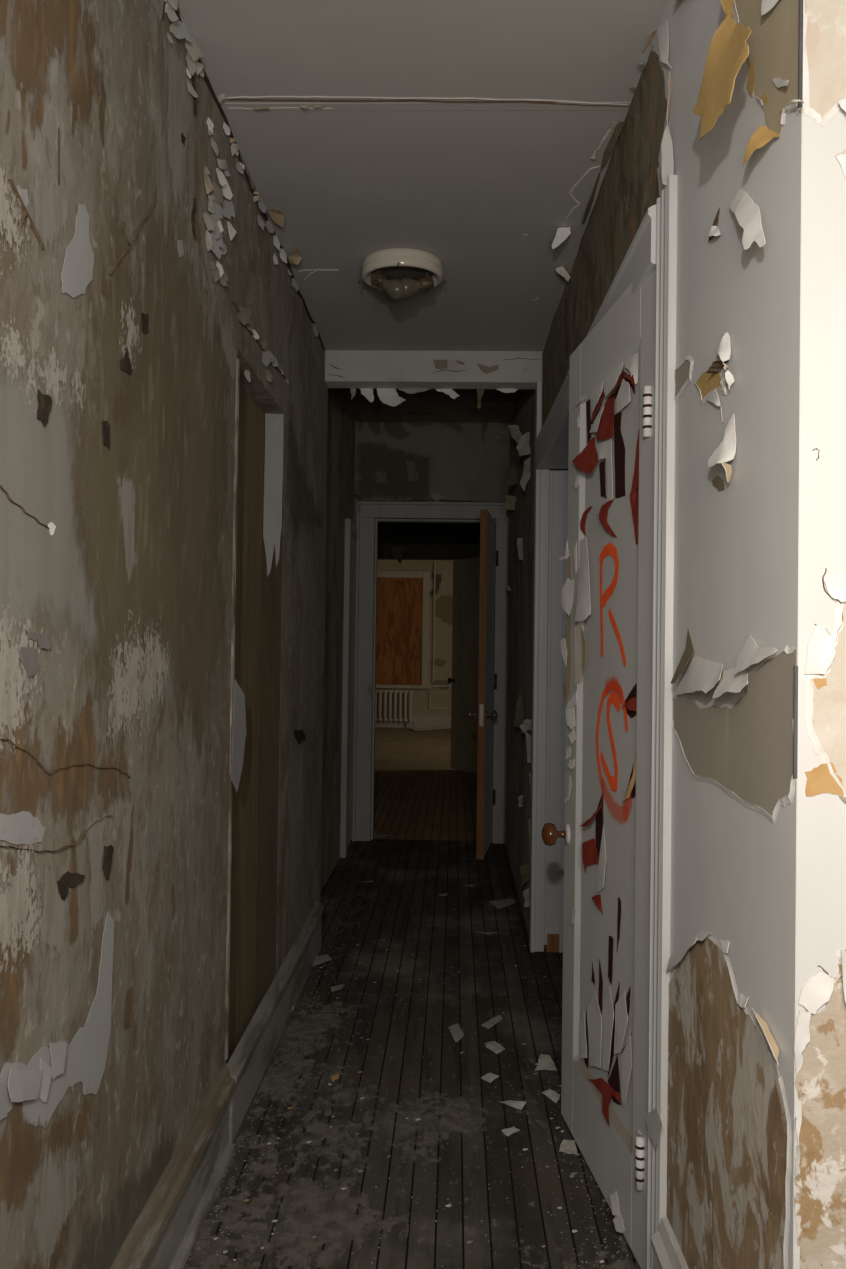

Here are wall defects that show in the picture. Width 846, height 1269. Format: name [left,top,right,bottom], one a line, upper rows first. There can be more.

peeling [164,0,204,98]
peeling [693,0,846,164]
peeling [203,118,245,286]
peeling [253,191,302,291]
flaking render [504,20,674,510]
peeling [729,188,766,250]
peeling [350,388,459,406]
peeling [708,413,736,483]
peeling [717,331,734,391]
peeling [671,568,846,823]
leakage [0,831,44,973]
peeling [645,929,846,1269]